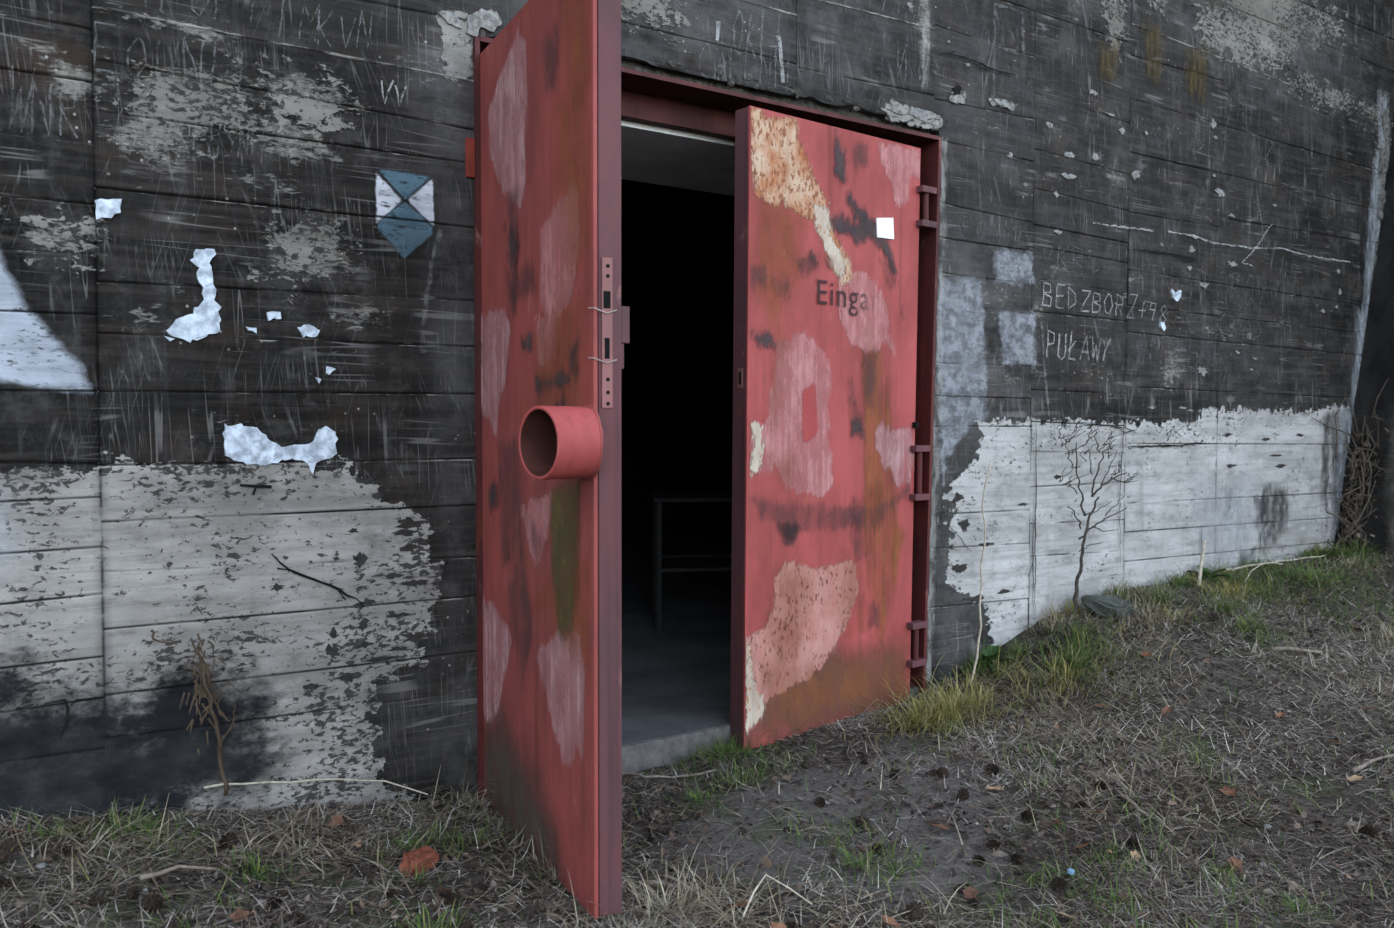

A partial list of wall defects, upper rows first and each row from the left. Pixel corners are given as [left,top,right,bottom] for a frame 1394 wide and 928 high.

peeling [435,8,502,83]
spalling [621,0,967,134]
corrosion [751,107,858,286]
peeling [942,403,1352,647]
peeling [0,451,445,815]